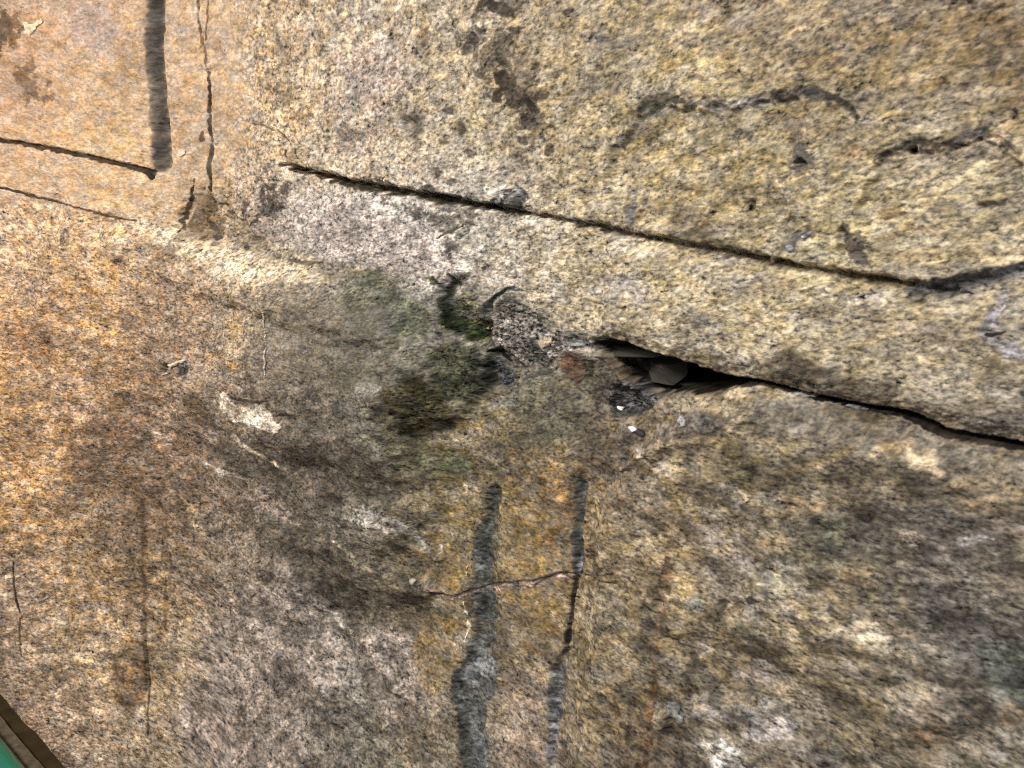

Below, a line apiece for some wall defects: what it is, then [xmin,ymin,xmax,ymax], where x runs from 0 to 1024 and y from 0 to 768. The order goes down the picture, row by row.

crack [197,0,214,194]
crack [436,225,463,239]
crack [737,377,1024,450]
water stain [173,601,324,768]
water stain [203,374,502,768]
crack [426,572,635,600]
water stain [545,476,588,762]